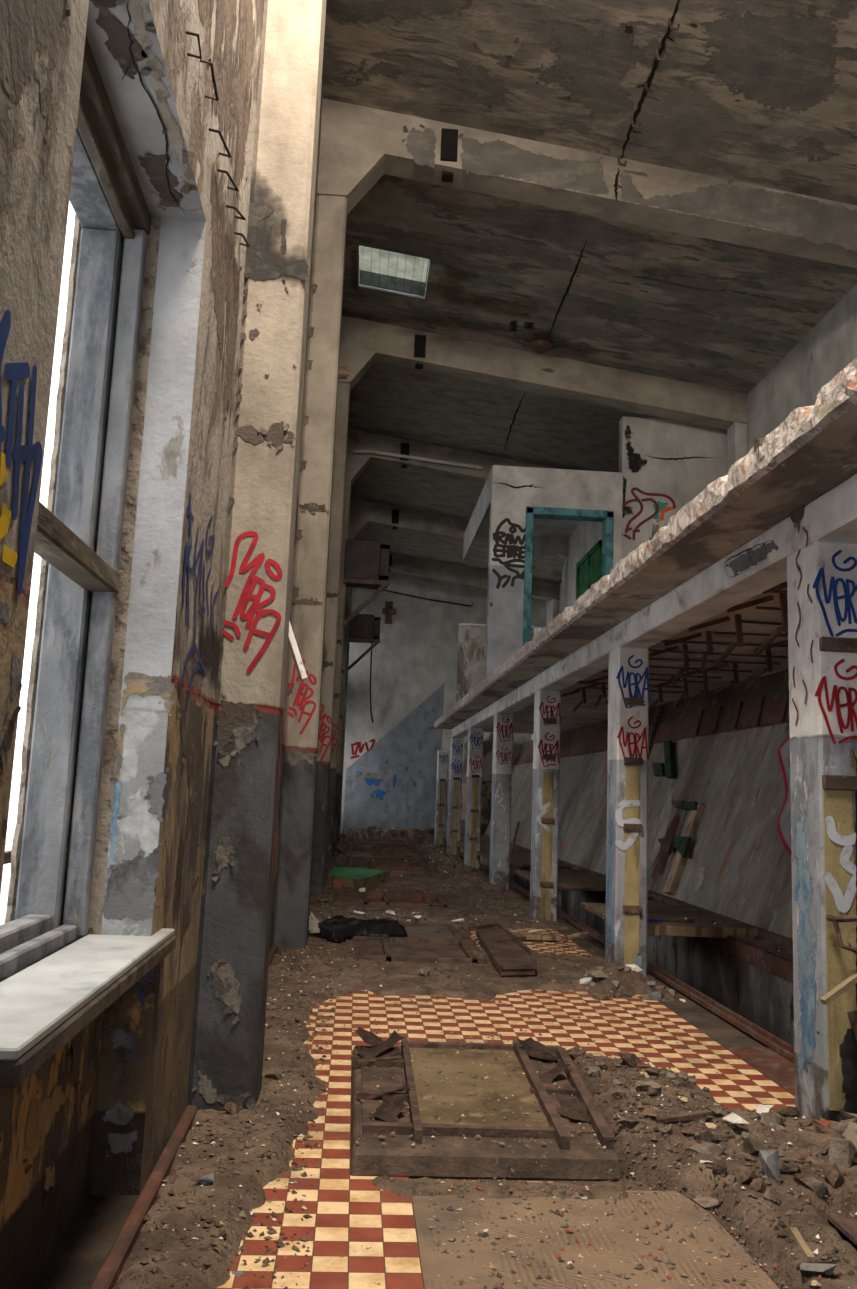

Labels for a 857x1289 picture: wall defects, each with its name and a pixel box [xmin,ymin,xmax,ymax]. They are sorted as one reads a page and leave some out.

crack [614,0,680,202]
peeling [90,0,309,450]
damp [243,177,310,296]
damp [441,266,537,332]
crack [547,237,588,341]
crack [504,393,525,450]
spalling [753,436,764,453]
peeling [726,540,779,575]
spalling [790,505,804,528]
peeling [102,672,262,946]
peeling [23,1079,138,1205]